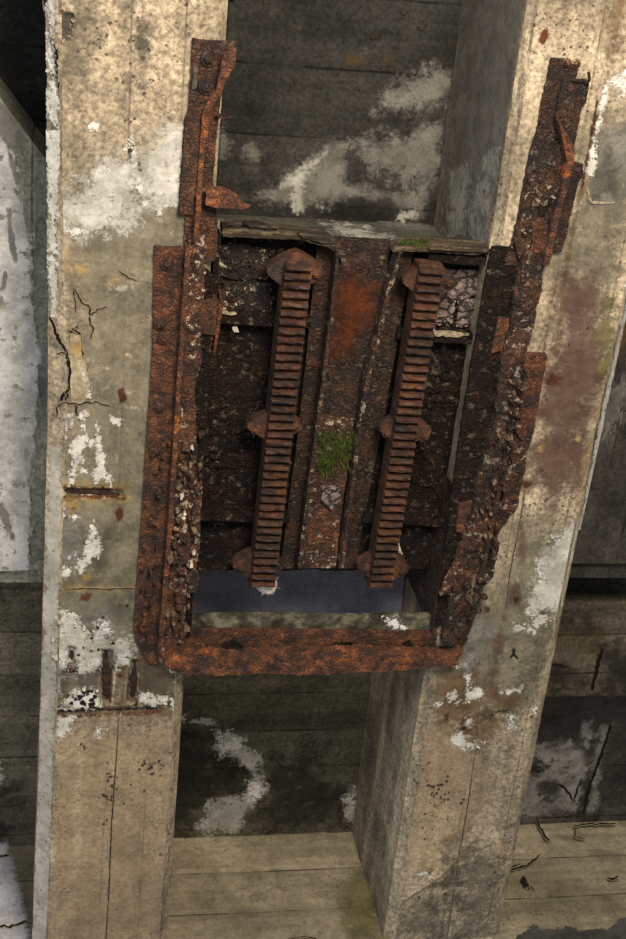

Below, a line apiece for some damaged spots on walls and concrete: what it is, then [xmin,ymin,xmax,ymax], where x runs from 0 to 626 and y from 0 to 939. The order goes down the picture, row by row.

water stain [258,0,524,245]
water stain [548,123,626,291]
crack [48,287,111,419]
rust [149,430,205,585]
rust [165,587,190,643]
water stain [0,104,356,939]
rust [437,366,530,751]
water stain [433,297,626,819]
crack [591,648,604,691]
crack [558,724,616,840]
crack [0,921,27,929]
peeling [516,917,626,939]